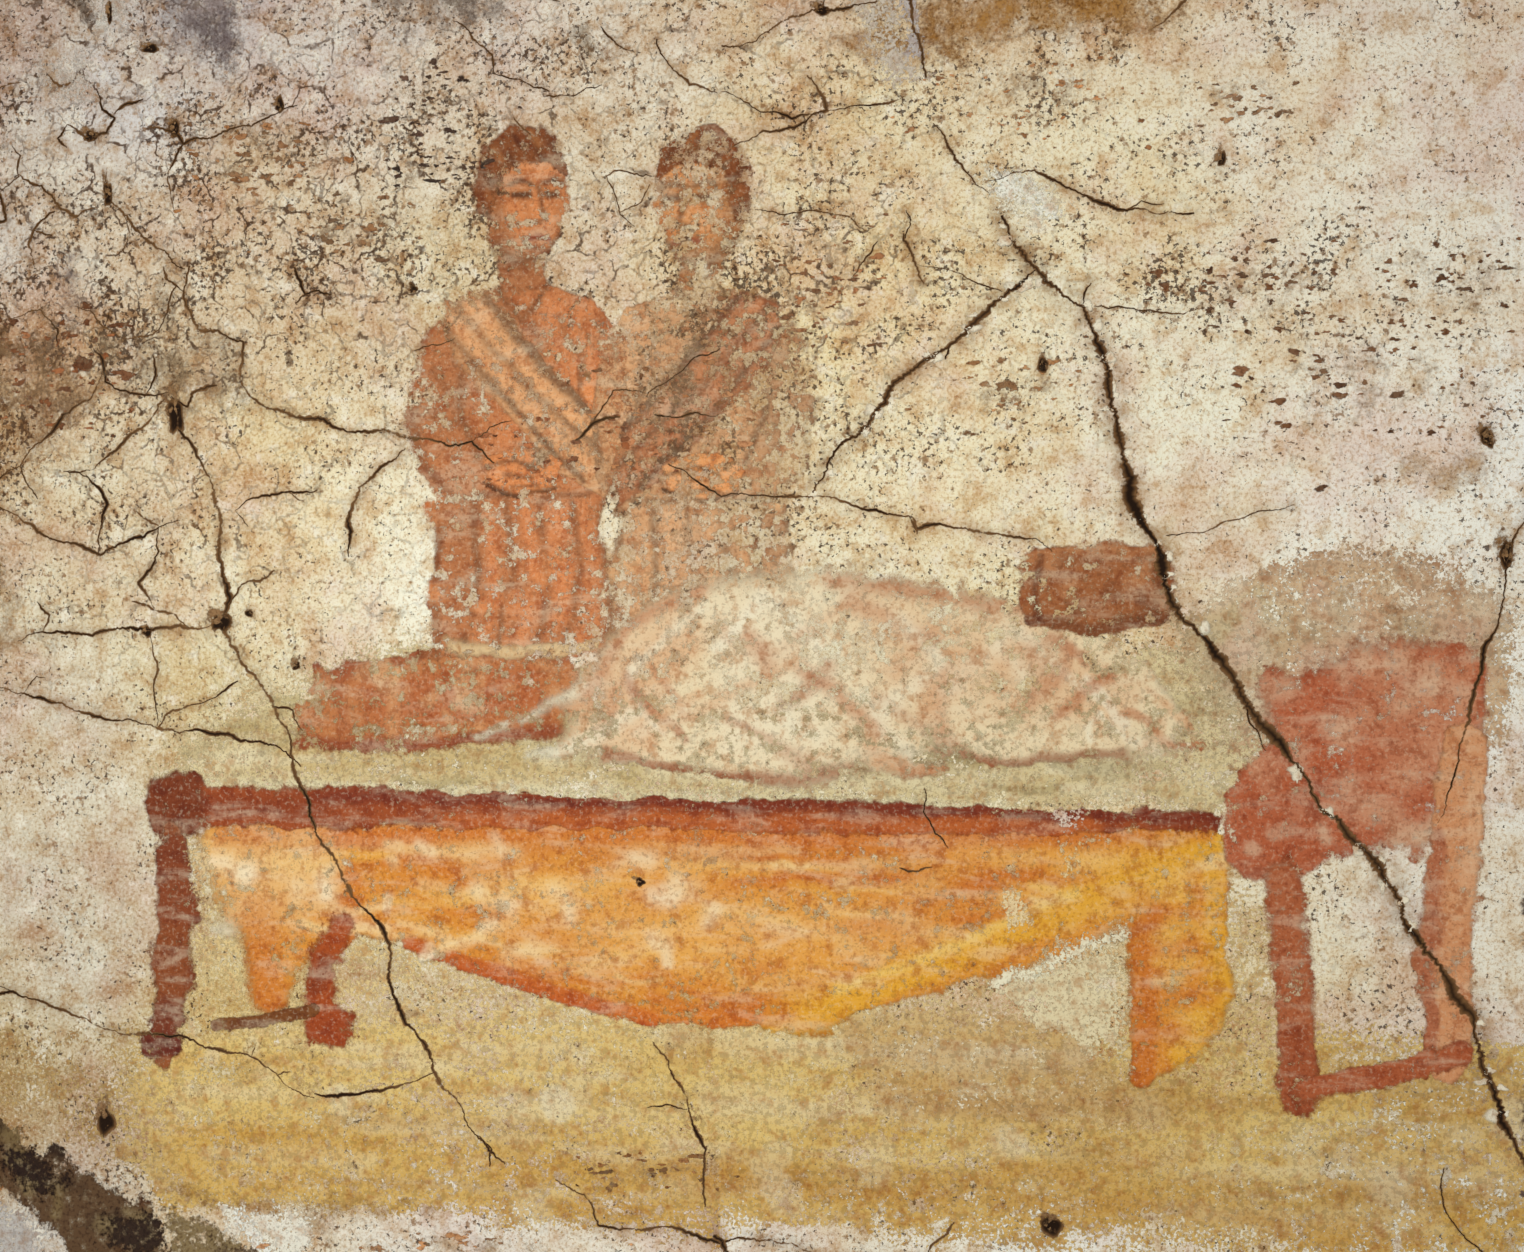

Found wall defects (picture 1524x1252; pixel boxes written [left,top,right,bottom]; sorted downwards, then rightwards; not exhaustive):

crack [455,21,600,135]
crack [601,0,927,148]
crack [0,72,297,212]
crack [603,170,652,227]
crack [575,349,719,441]
crack [0,146,509,1167]
crack [668,123,1524,1165]
hole [93,1095,116,1136]
crack [555,1041,810,1252]
flaking render [0,1202,54,1252]
flaking render [216,1194,318,1252]
crack [1439,1168,1483,1252]